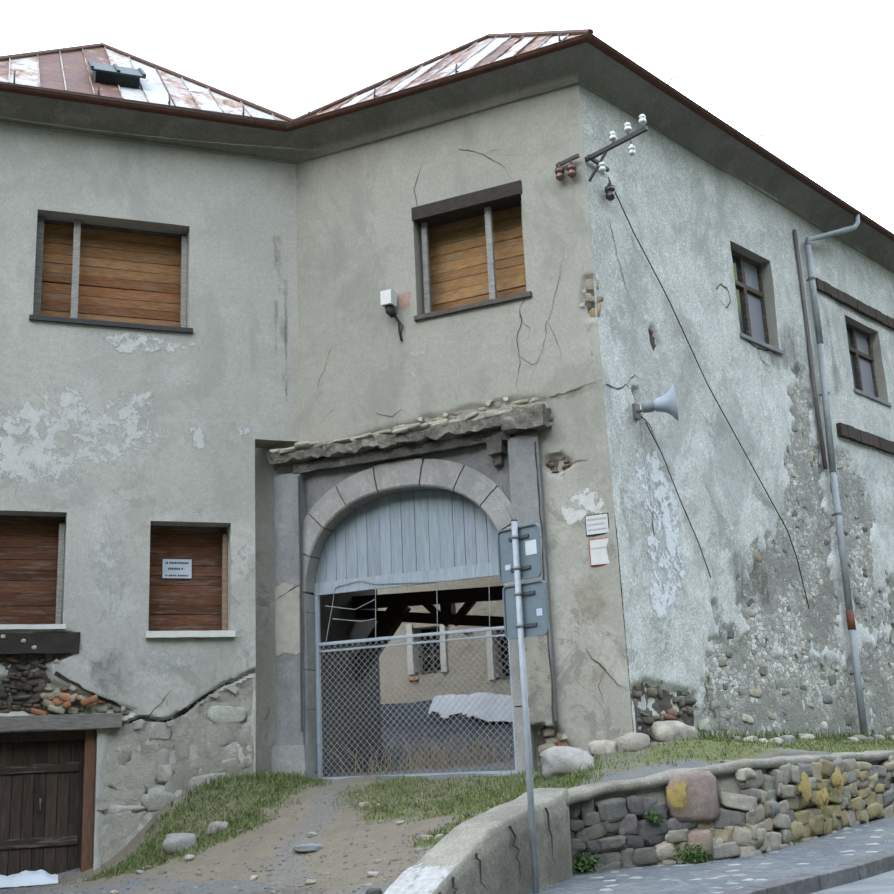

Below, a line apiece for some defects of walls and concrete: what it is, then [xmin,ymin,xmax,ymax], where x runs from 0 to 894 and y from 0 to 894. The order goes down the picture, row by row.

crack [458,149,514,181]
peeling [0,377,162,486]
peeling [105,332,196,353]
crack [516,247,564,395]
flaking render [579,279,604,317]
crack [549,375,647,398]
crack [534,442,545,581]
peeling [561,488,606,525]
spalling [630,366,894,740]
crack [54,671,254,726]
crack [547,633,555,726]
spalling [0,654,254,865]